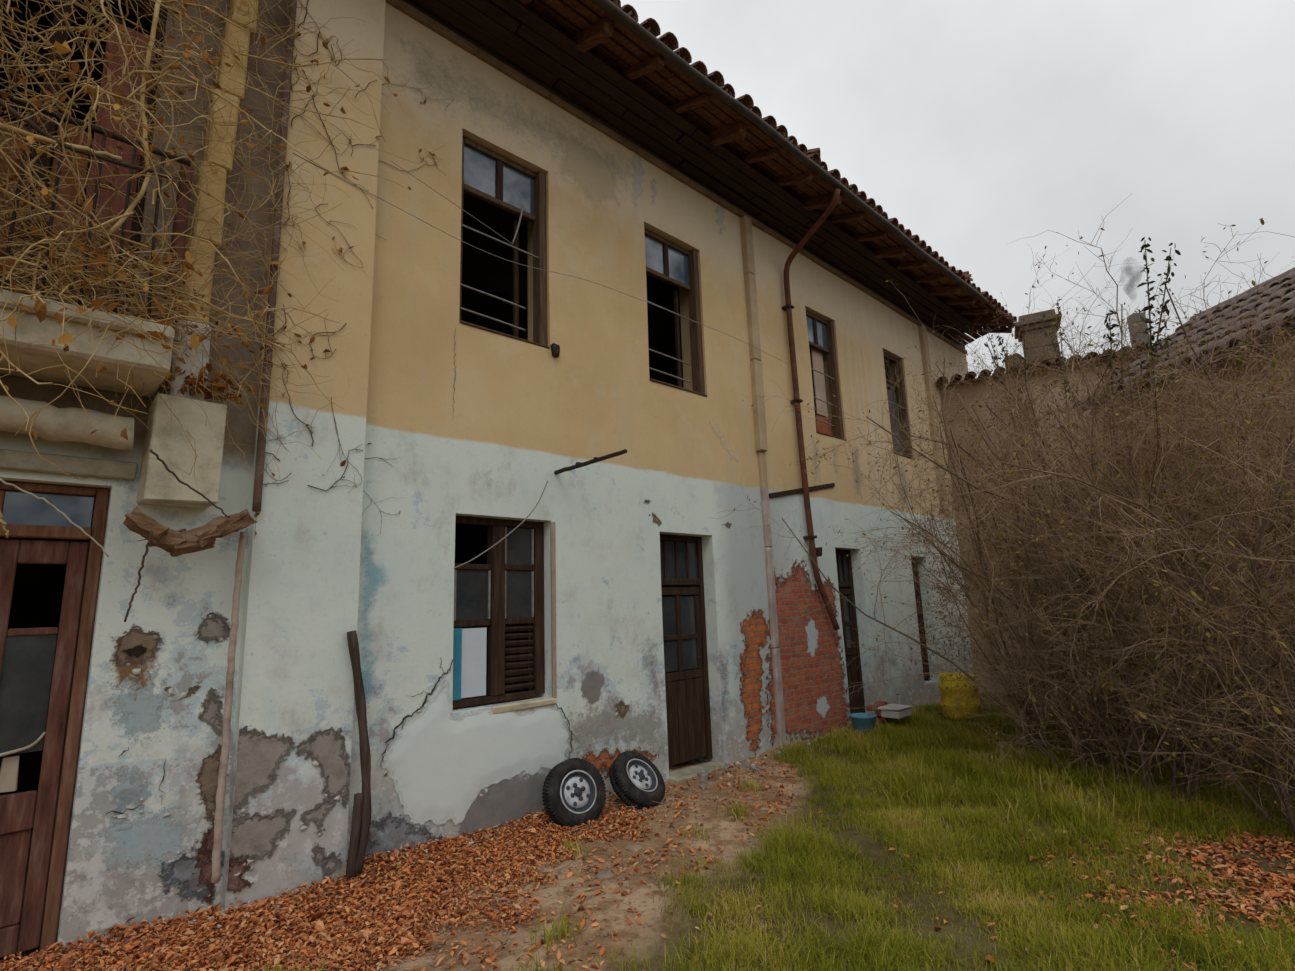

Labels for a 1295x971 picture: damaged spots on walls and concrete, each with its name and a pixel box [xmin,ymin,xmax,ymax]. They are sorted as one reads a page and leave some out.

spalling [193,612,231,646]
spalling [82,624,351,904]
crack [380,658,454,767]
flaking render [739,559,851,755]